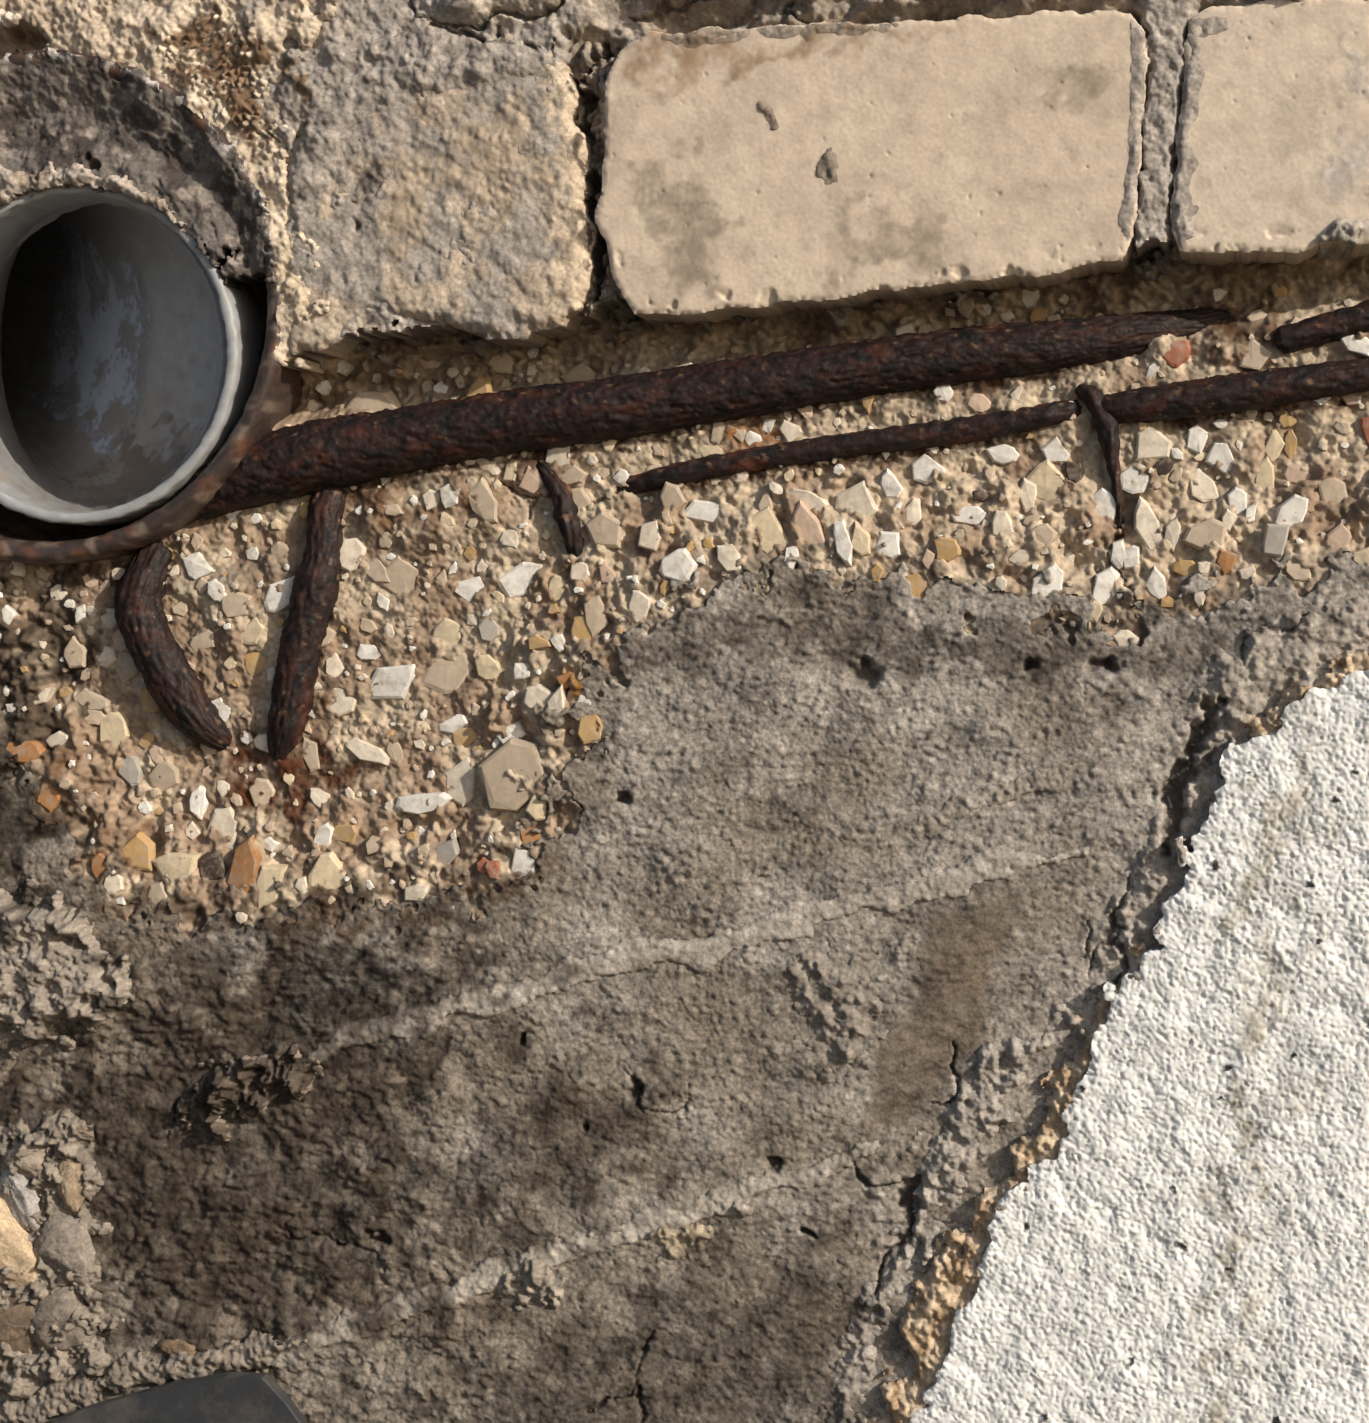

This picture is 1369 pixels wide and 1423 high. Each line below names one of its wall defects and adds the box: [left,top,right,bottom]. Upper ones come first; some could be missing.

crack [568,51,609,291]
rust [350,458,493,546]
spalling [0,0,1369,938]
rust [614,403,841,451]
rust [679,467,780,489]
rust [799,446,951,473]
rust [951,369,1062,393]
rust [983,429,1044,446]
damp [0,560,127,938]
rust [227,726,374,823]
damp [0,910,451,1350]
crack [858,1172,921,1295]